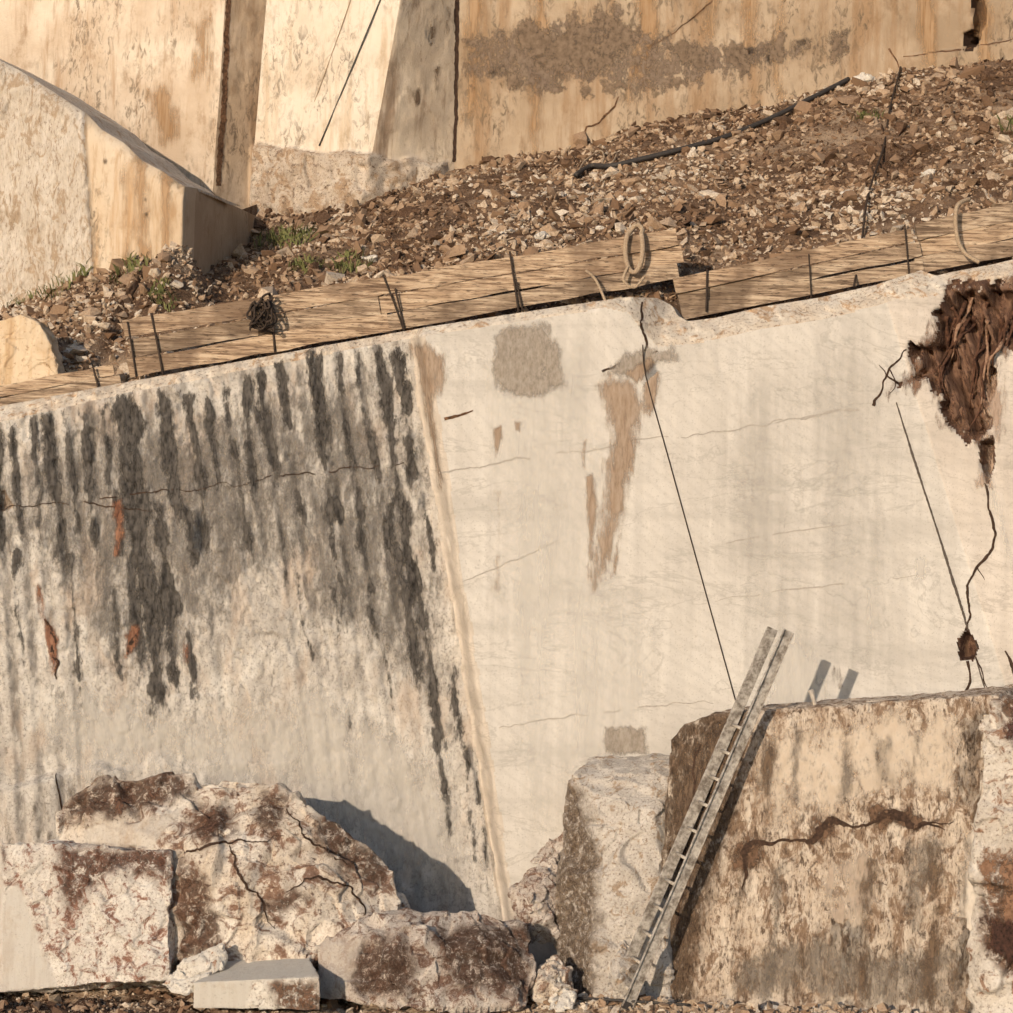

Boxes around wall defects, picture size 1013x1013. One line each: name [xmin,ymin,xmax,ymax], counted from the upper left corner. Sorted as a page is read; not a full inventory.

crack [888,0,1013,67]
leakage [492,324,563,398]
spalling [897,276,1013,488]
leakage [586,358,659,588]
crack [964,482,997,633]
crack [965,656,987,690]
crack [1005,651,1013,673]
crack [740,809,952,890]